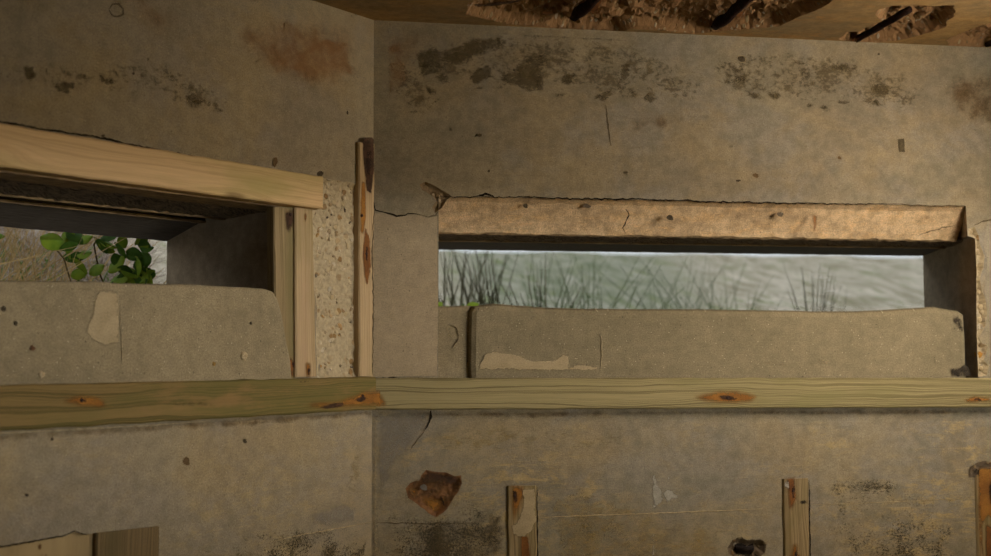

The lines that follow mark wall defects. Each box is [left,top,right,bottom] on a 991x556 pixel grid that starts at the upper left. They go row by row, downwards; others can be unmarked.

spalling [465,0,832,34]
spalling [839,5,991,48]
peeling [401,38,686,104]
crack [371,192,991,373]
crack [411,411,432,449]
mould [386,501,502,556]
hole [728,537,767,556]